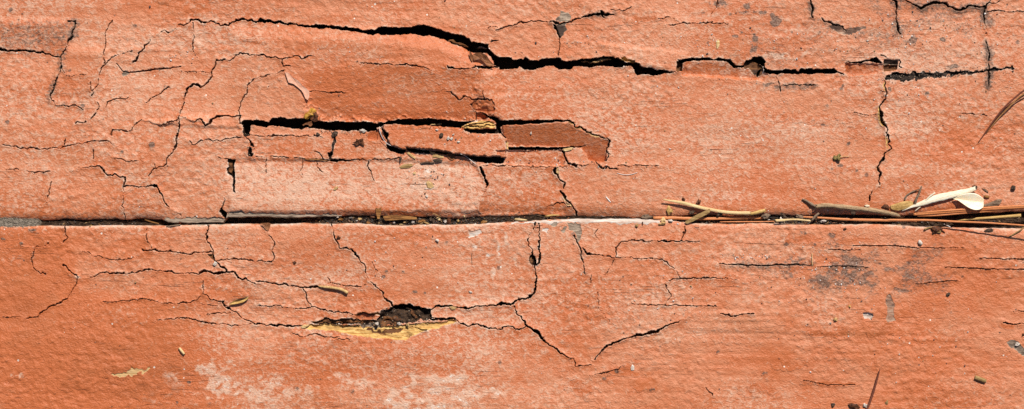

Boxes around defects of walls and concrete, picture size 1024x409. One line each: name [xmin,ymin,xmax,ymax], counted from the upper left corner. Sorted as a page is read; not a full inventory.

peeling [382,122,609,162]
crack [0,0,1024,220]
crack [2,225,393,340]